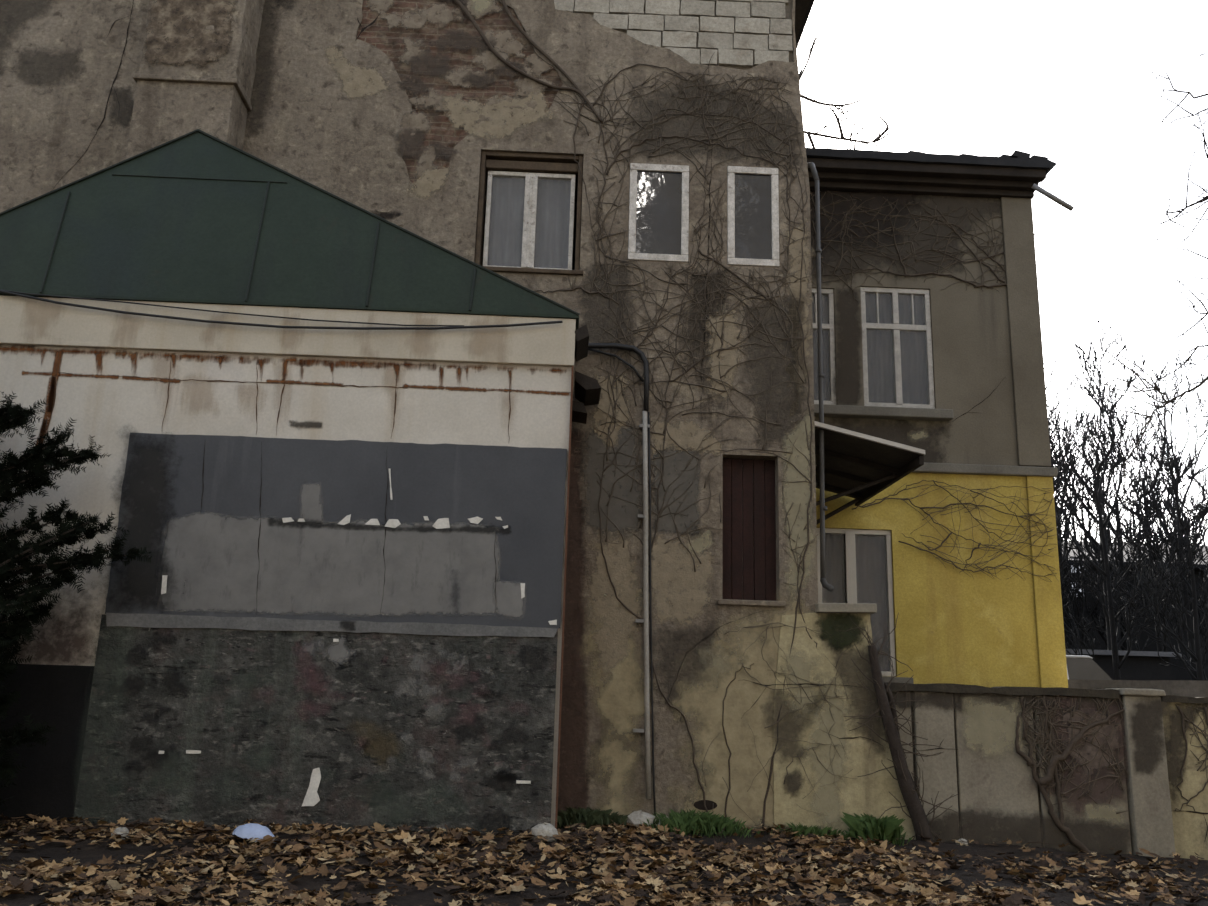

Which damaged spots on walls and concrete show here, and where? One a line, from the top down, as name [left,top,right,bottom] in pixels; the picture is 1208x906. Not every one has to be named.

leakage [0,0,79,86]
leakage [110,88,134,126]
spalling [326,0,563,199]
corrosion [0,345,569,446]
peeling [160,483,525,618]
peeling [302,768,321,806]
leakage [767,691,818,757]
leakage [820,636,1208,855]